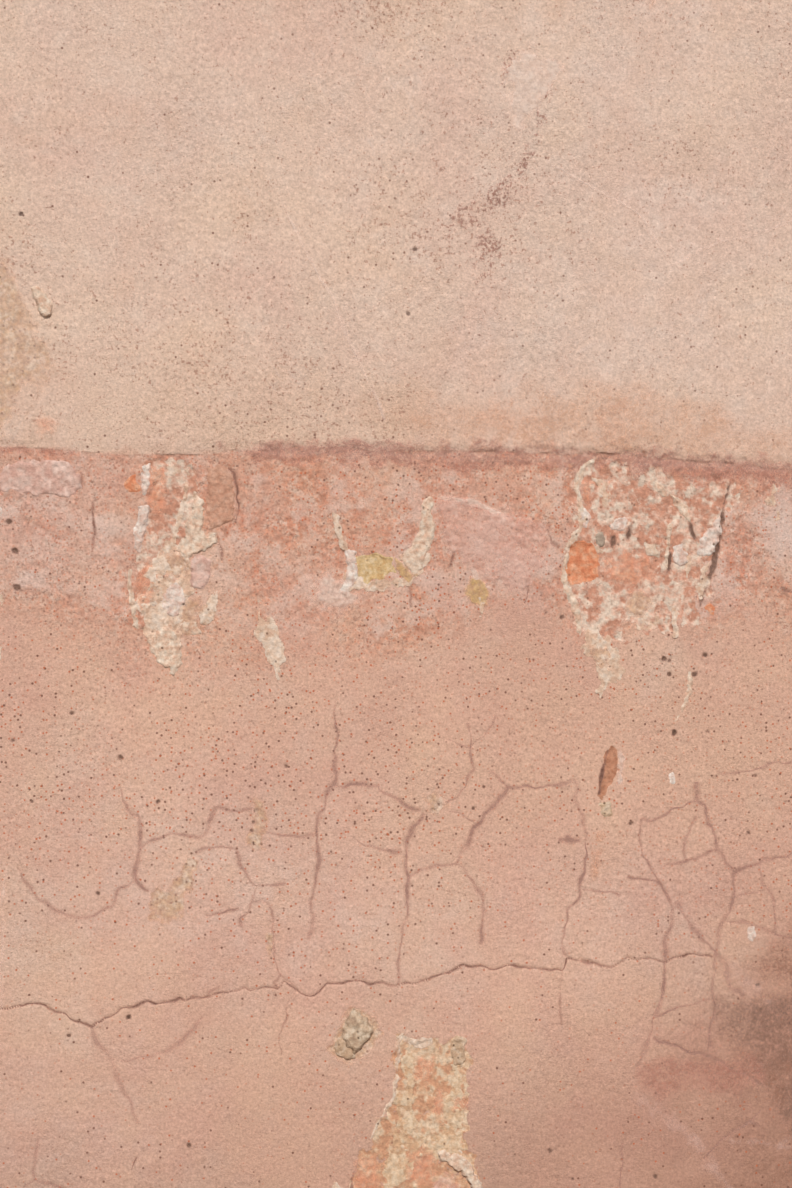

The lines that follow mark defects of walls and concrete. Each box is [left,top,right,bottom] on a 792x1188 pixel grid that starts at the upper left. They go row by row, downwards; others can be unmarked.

peeling [124,457,218,676]
peeling [318,496,436,606]
peeling [560,451,747,698]
crack [133,831,156,890]
crack [314,720,366,885]
crack [399,800,424,914]
crack [468,784,558,841]
crack [564,844,588,929]
crack [0,925,619,1027]
peeling [332,1033,483,1188]
crack [656,932,766,1086]
damp [642,999,792,1116]